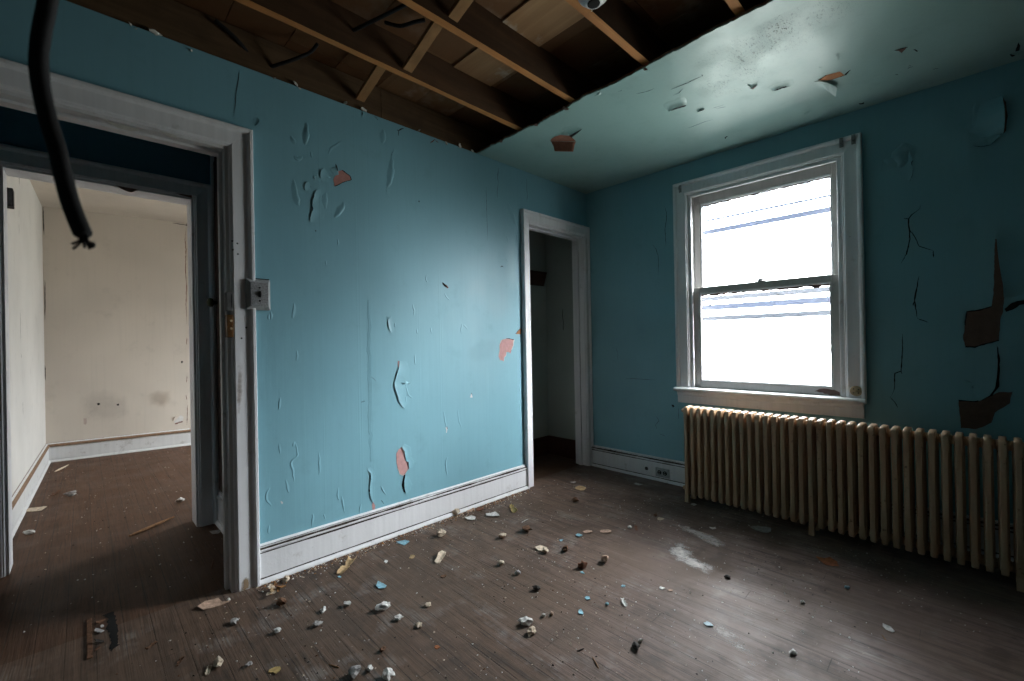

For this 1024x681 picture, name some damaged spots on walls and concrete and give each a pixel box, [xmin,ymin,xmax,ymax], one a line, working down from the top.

spalling [476,0,770,153]
peeling [815,81,837,97]
peeling [333,170,352,186]
crack [890,205,934,406]
peeling [963,226,1024,348]
peeling [499,329,521,361]
peeling [958,392,1012,429]
peeling [396,444,414,476]